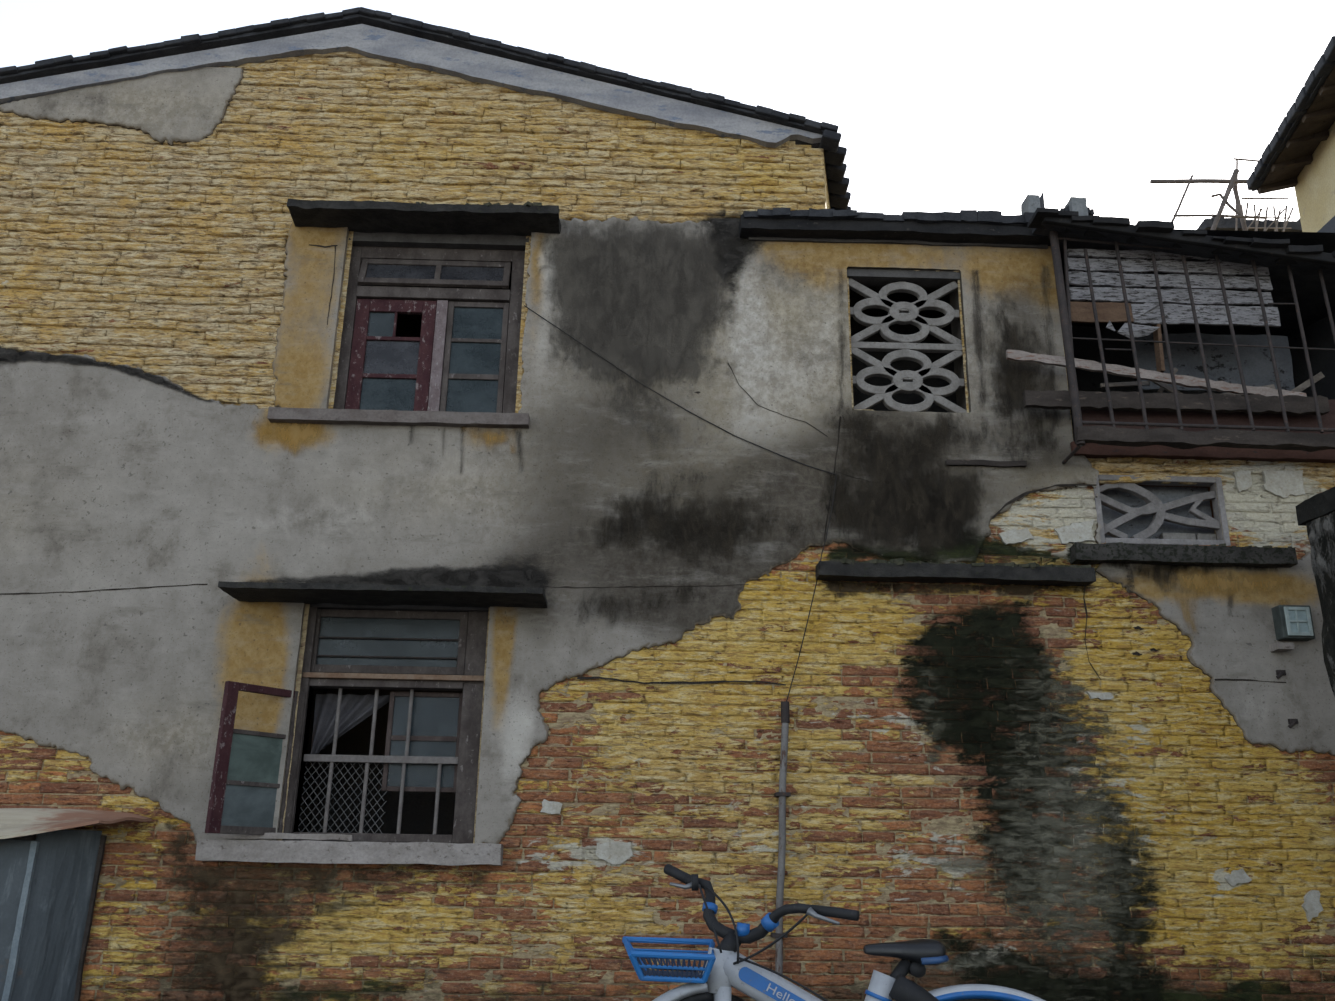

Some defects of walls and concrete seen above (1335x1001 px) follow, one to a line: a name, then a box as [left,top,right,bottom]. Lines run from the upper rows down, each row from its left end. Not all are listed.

flaking render [0,51,826,409]
damp [702,211,762,287]
damp [974,271,1057,451]
damp [601,490,768,562]
damp [827,404,987,552]
flaking render [913,457,1335,566]
crack [577,676,786,686]
flaking render [0,541,1335,1001]
damp [824,580,1166,1001]